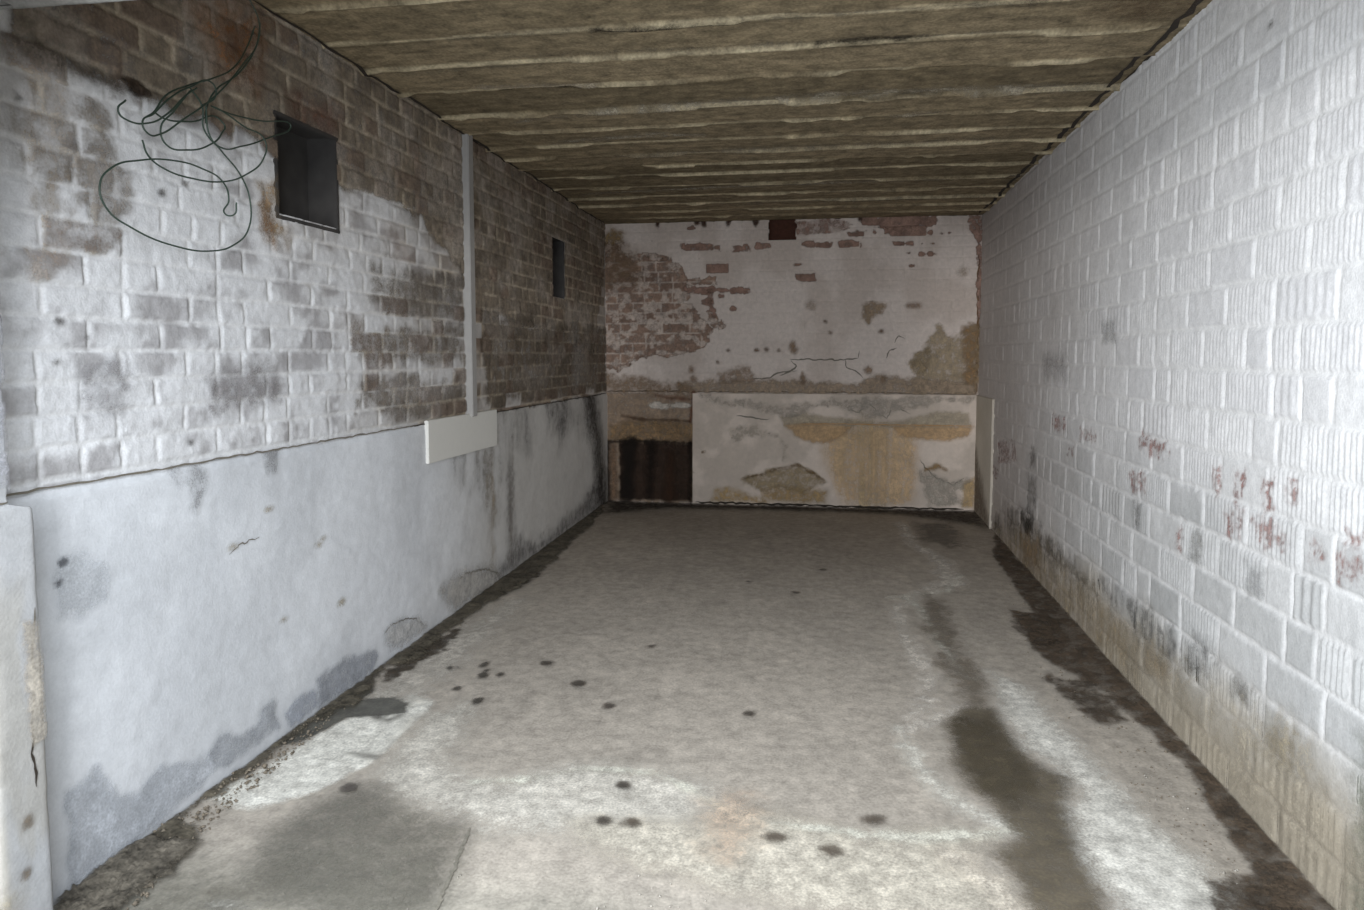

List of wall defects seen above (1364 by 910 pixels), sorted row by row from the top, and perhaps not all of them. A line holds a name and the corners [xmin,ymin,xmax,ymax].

peeling [3,0,951,504]
peeling [909,215,983,395]
crack [30,723,38,787]
water stain [213,523,1234,910]
water stain [483,374,1206,724]